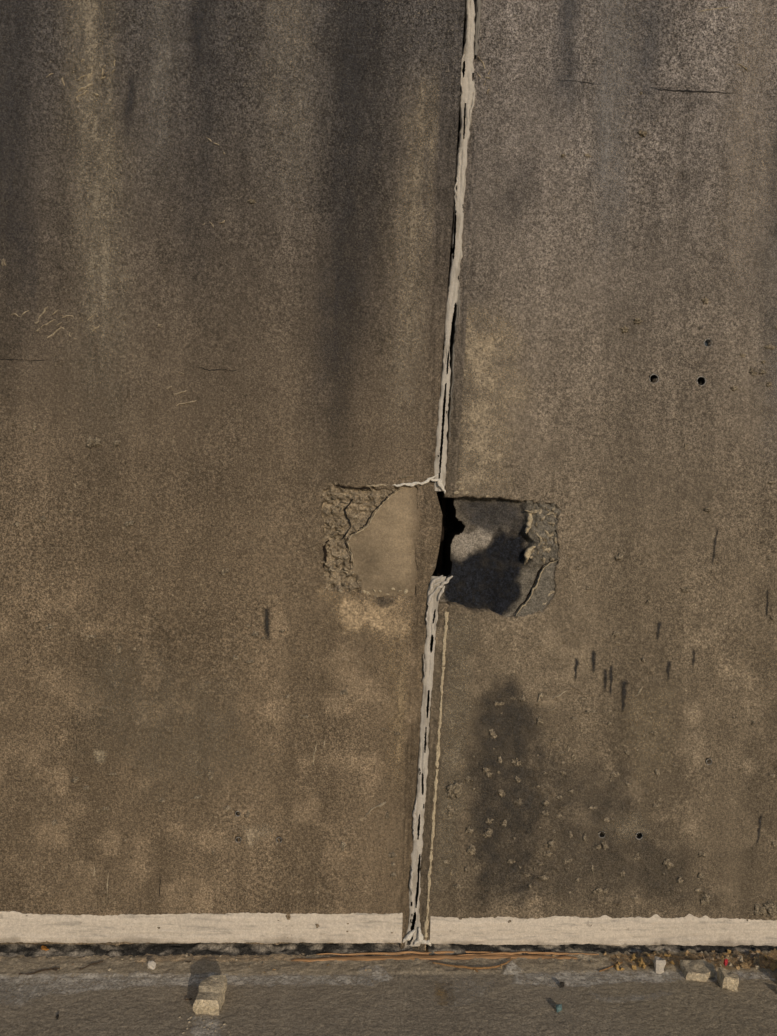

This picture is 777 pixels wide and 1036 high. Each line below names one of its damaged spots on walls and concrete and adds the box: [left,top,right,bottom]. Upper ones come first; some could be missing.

spalling [313,477,422,606]
spalling [432,481,564,619]
water stain [591,651,627,710]
water stain [473,684,542,894]